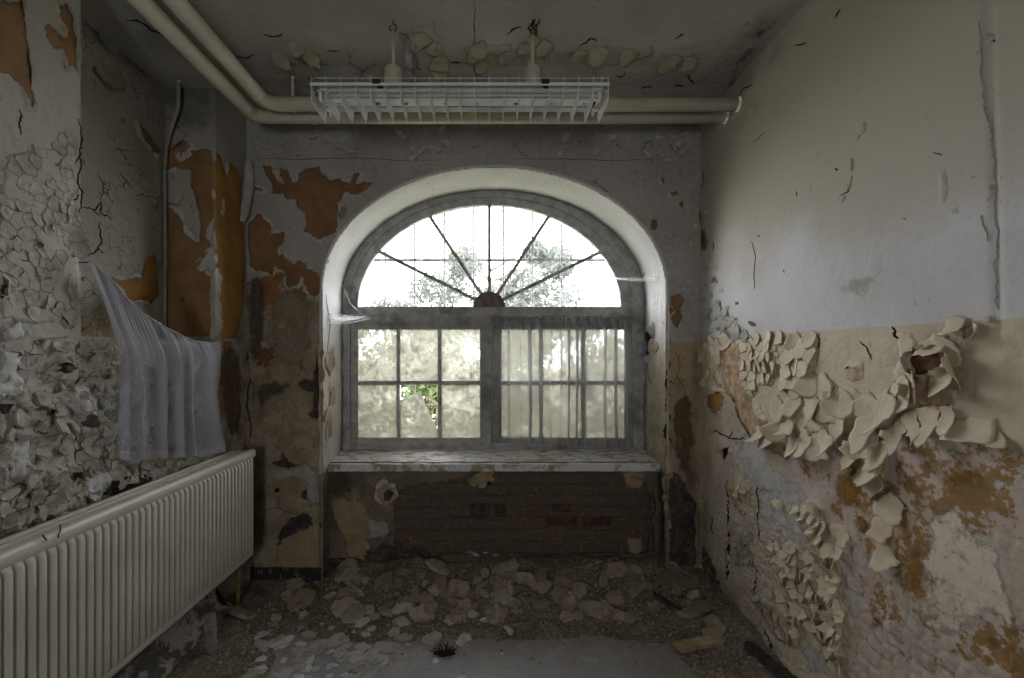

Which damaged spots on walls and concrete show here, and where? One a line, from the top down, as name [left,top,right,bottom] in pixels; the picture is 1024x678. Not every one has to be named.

peeling [0,0,38,113]
peeling [44,0,82,73]
peeling [516,35,554,68]
crack [73,119,159,256]
peeling [112,118,373,341]
crack [978,22,999,309]
peeling [0,132,153,533]
flaking render [298,345,336,443]
peeling [697,186,1007,573]
flaking render [268,451,322,567]
flaking render [331,469,700,567]
peeling [726,493,860,678]